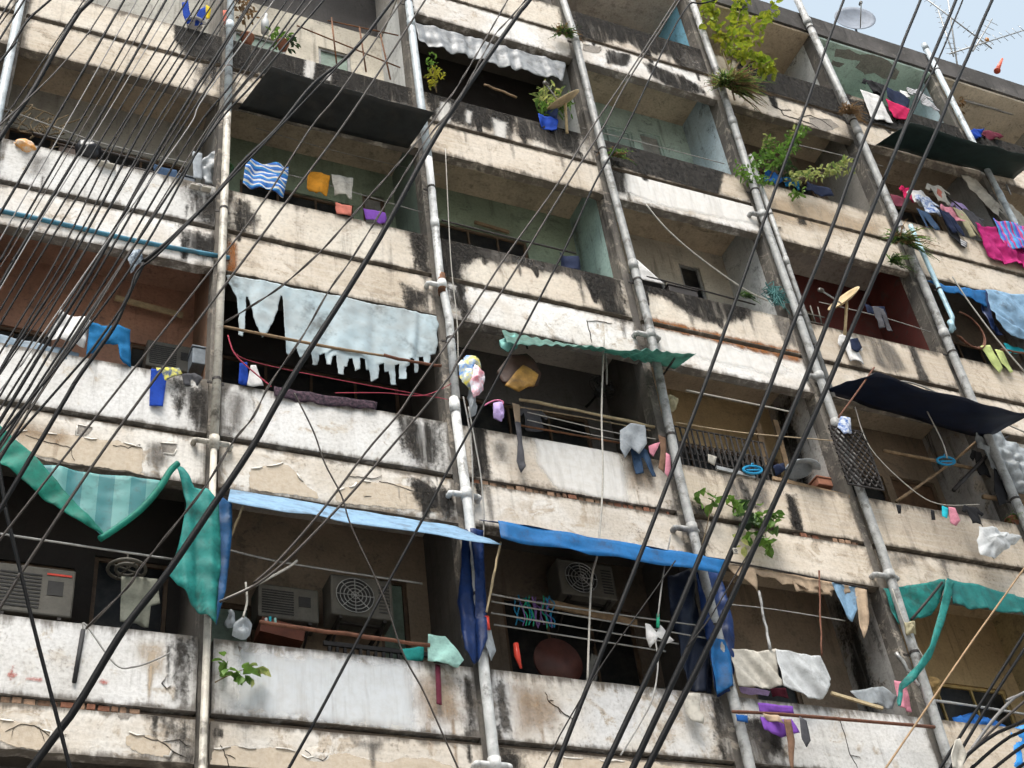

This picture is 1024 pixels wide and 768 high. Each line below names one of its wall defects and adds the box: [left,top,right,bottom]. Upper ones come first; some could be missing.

leakage [424,92,583,160]
leakage [180,191,215,259]
peeling [15,424,144,475]
peeling [161,442,177,456]
leakage [172,378,207,427]
peeling [249,462,319,499]
leakage [398,414,455,518]
leakage [776,397,802,459]
leakage [786,477,809,531]
leakage [147,637,195,703]
crack [5,724,67,741]
peeling [0,696,172,758]